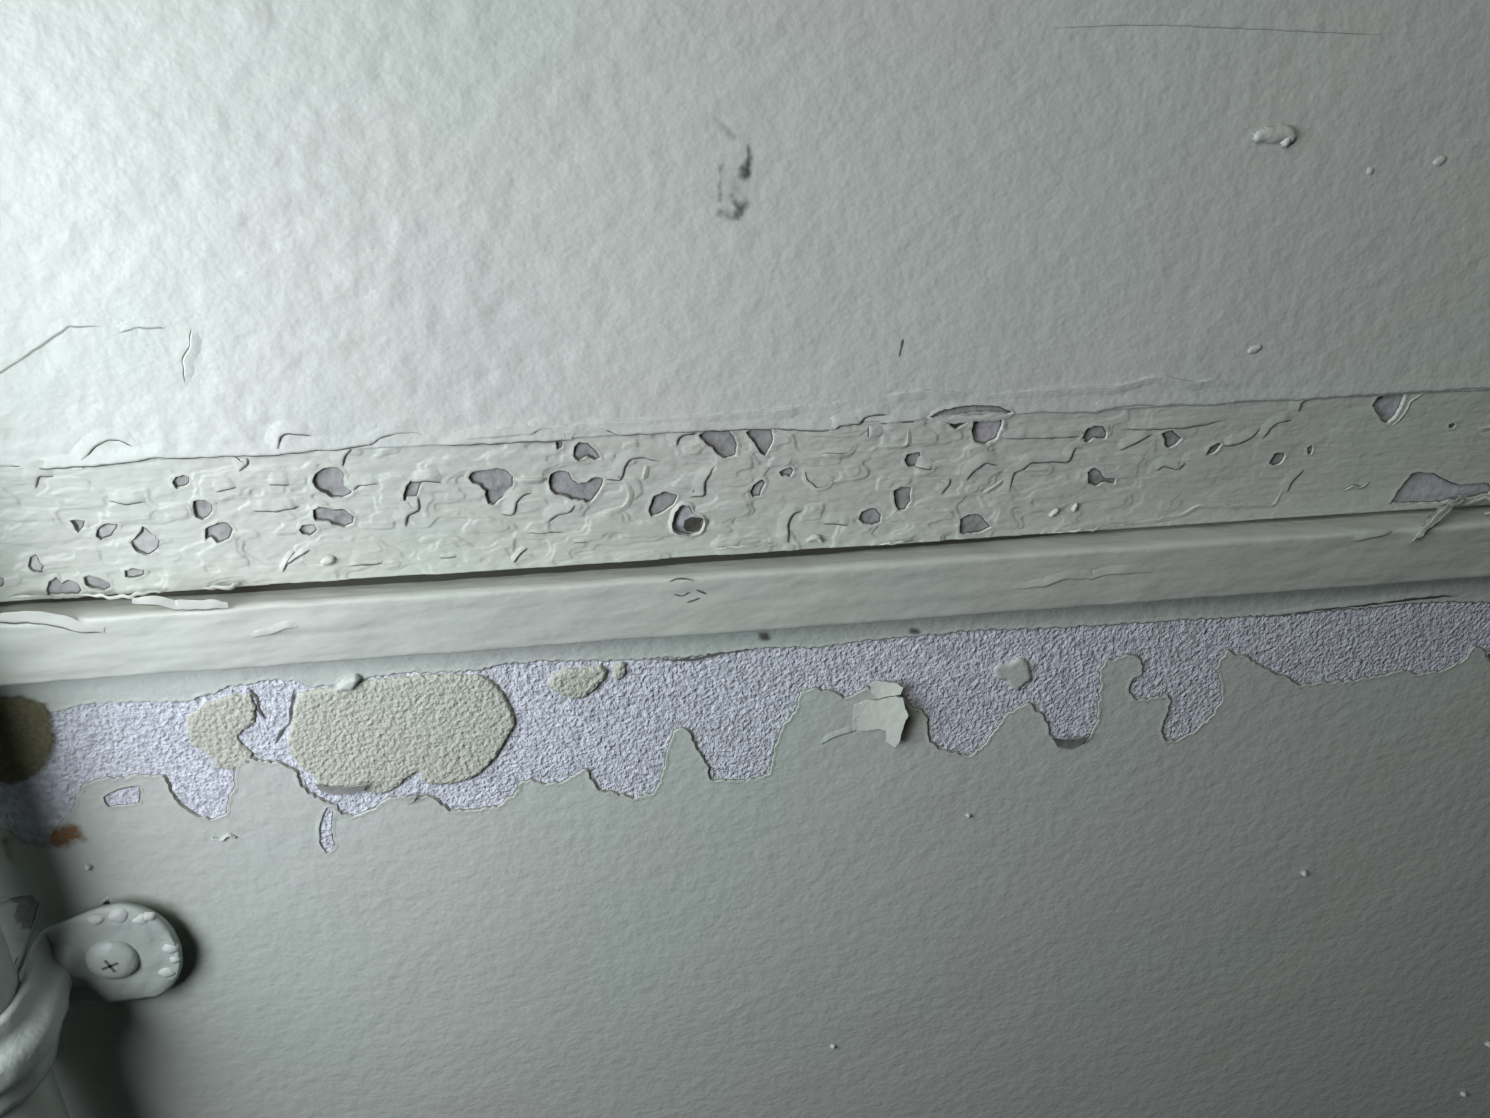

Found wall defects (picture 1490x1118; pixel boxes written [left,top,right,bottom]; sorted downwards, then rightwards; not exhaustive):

peeling [71,427,136,469]
peeling [109,488,143,505]
peeling [168,457,249,545]
peeling [264,419,313,449]
peeling [252,449,383,572]
peeling [392,468,442,527]
peeling [456,415,858,563]
peeling [823,400,1316,538]
peeling [1388,469,1490,507]
peeling [23,516,163,599]
peeling [0,597,1490,856]